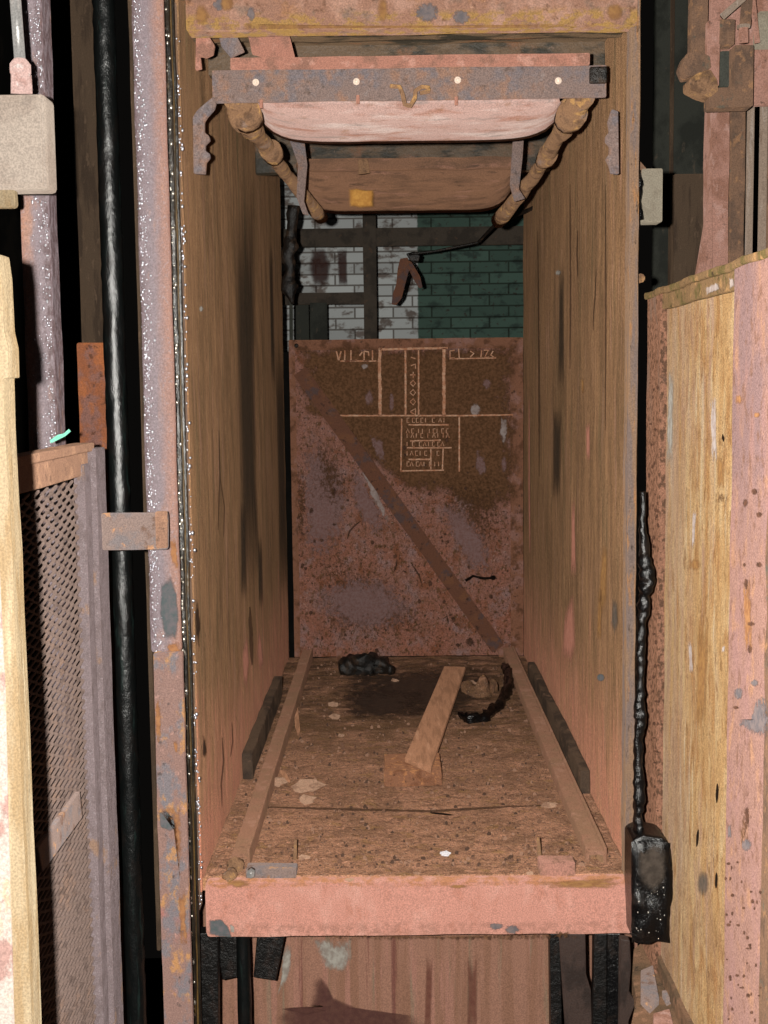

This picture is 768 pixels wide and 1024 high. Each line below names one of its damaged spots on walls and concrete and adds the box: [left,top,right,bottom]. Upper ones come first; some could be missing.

rust [263,0,546,29]
rust [301,346,517,541]
rust [297,449,441,653]
rust [166,809,180,873]